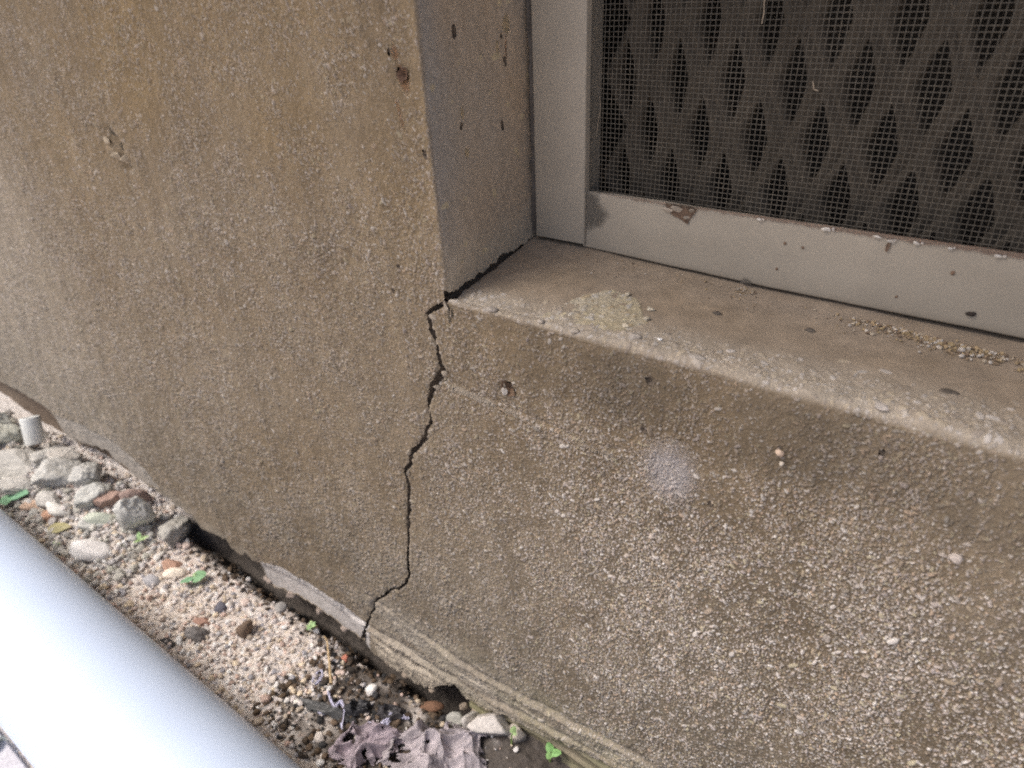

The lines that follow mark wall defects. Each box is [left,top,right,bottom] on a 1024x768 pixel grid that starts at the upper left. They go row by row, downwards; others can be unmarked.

peeling [663,203,697,224]
crack [360,240,529,643]